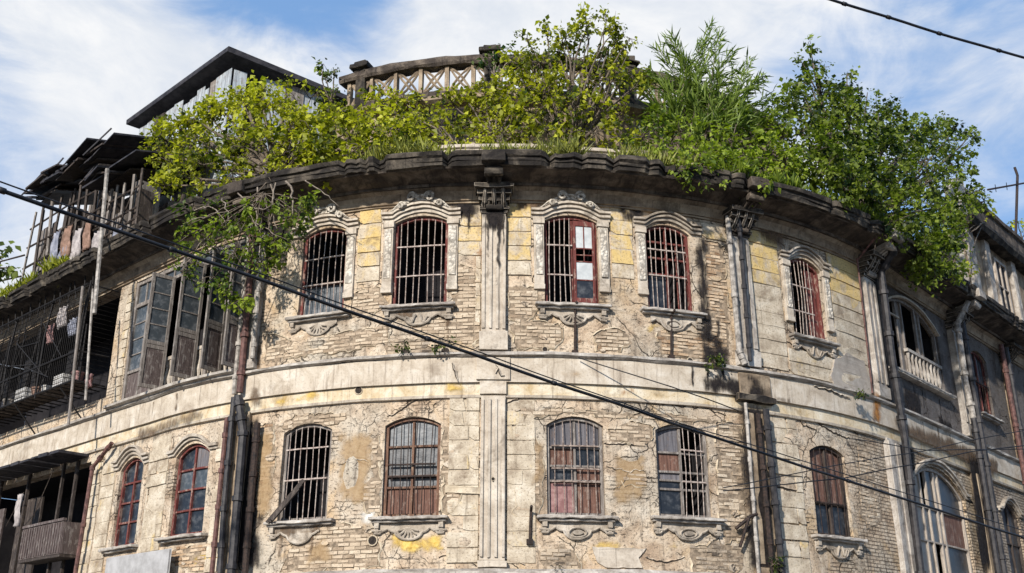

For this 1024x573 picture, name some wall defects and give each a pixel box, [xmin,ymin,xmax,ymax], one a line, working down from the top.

crack [800,420,858,439]
spalling [506,407,747,573]
spalling [279,519,443,573]